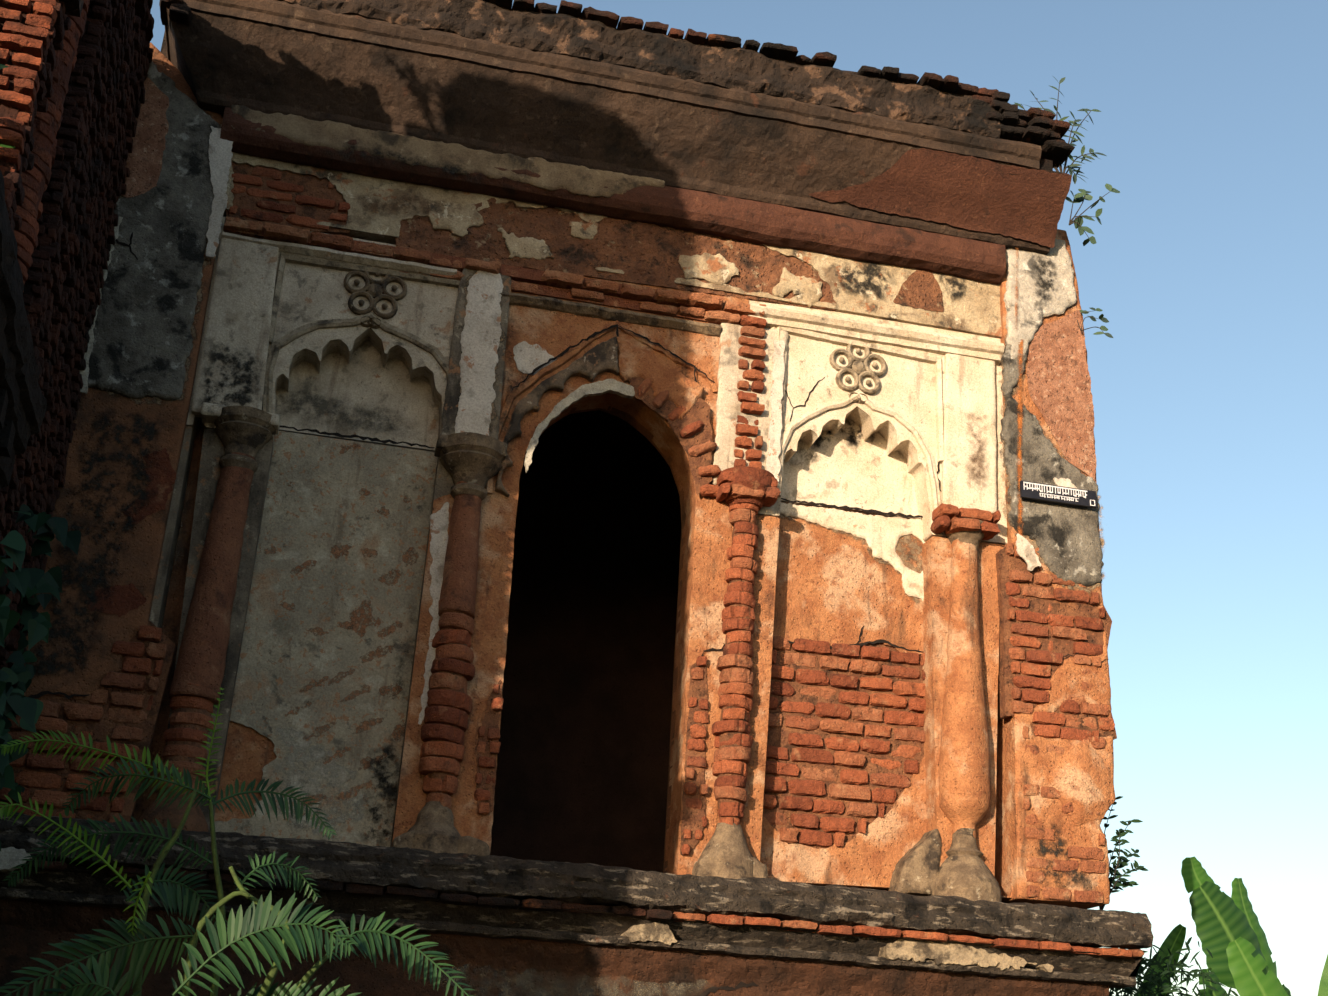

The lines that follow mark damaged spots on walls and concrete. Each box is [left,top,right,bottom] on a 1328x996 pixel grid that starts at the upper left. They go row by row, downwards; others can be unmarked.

leakage [30,413,159,676]
spalling [0,620,277,832]
flaking render [285,600,403,716]
flaking render [80,61,665,405]
flaking render [303,502,449,806]
flaking render [395,198,837,436]
flaking render [765,340,785,482]
spalling [762,636,926,849]
flaking render [780,502,925,603]
flaking render [809,148,1117,742]